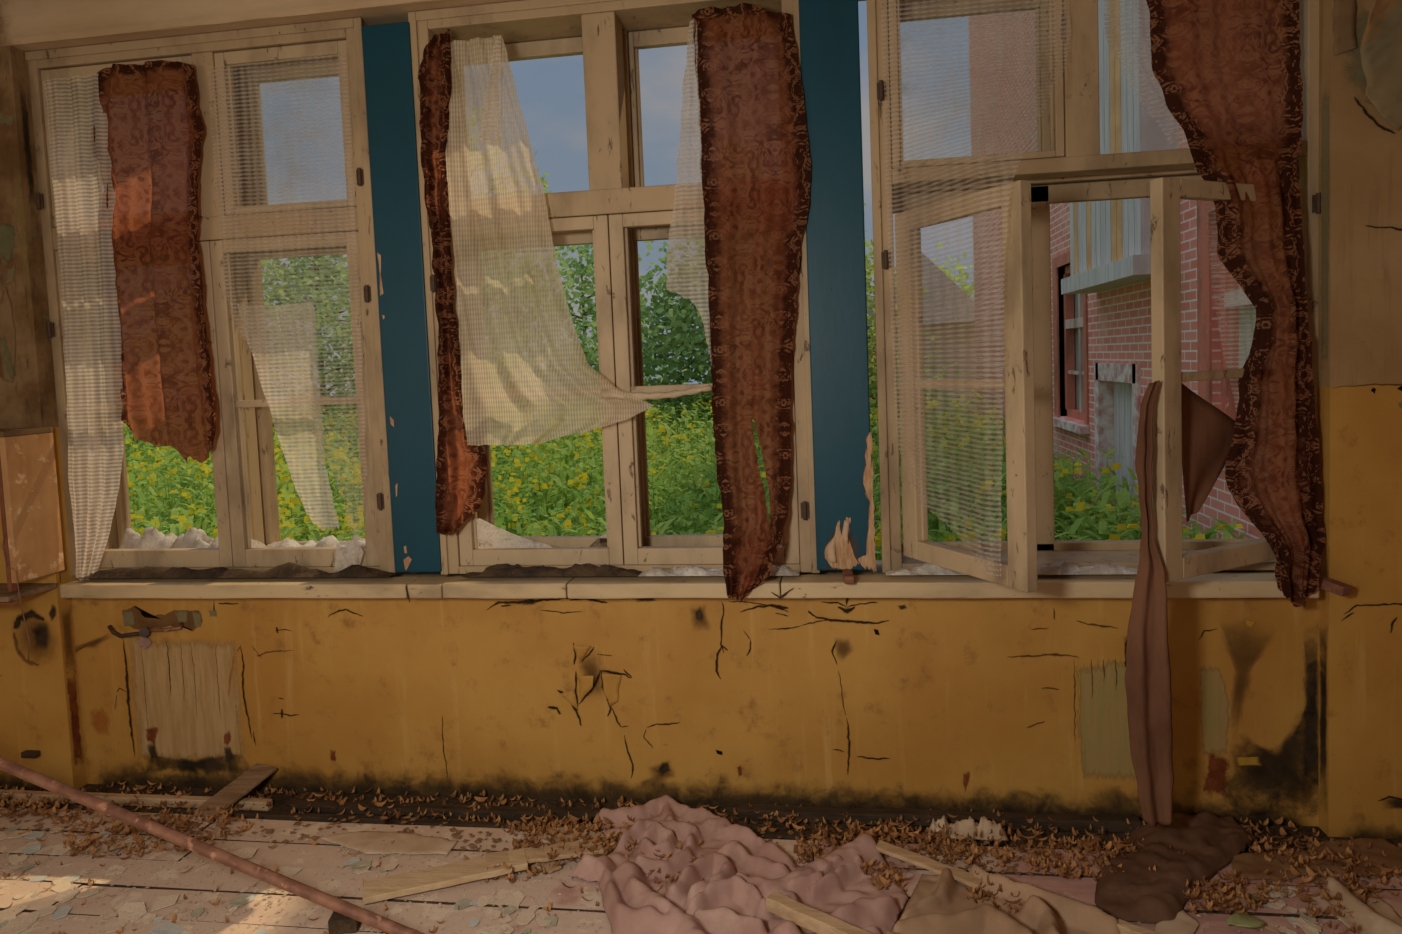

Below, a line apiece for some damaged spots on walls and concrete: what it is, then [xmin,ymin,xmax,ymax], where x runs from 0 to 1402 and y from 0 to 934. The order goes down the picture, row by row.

peeling [825,432,876,571]
damp [102,756,240,789]
crack [487,598,680,777]
damp [252,774,1143,821]
crack [715,588,889,679]
crack [833,671,890,774]
damp [1231,620,1260,702]
damp [1173,641,1326,826]